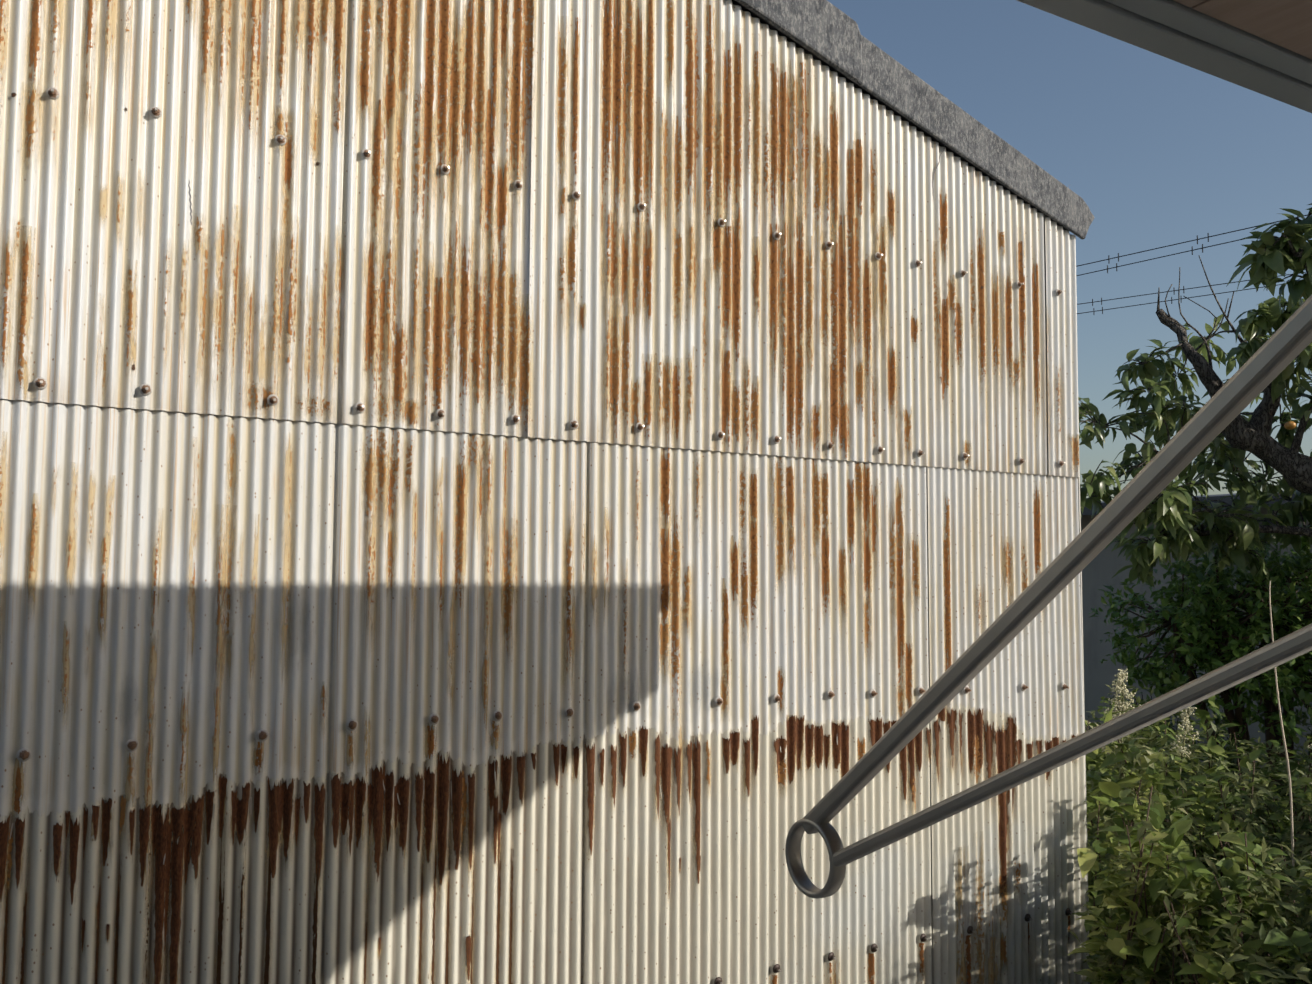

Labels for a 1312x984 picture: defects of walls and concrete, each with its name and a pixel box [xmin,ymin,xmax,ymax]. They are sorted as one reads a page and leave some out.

rust [23,0,64,166]
rust [84,0,131,114]
rust [557,17,586,329]
rust [2,221,32,394]
rust [126,268,136,366]
rust [164,0,536,776]
rust [601,0,920,777]
rust [933,194,1080,471]
rust [943,498,952,670]
rust [1002,489,1041,607]
rust [419,850,451,984]
rust [496,837,514,984]